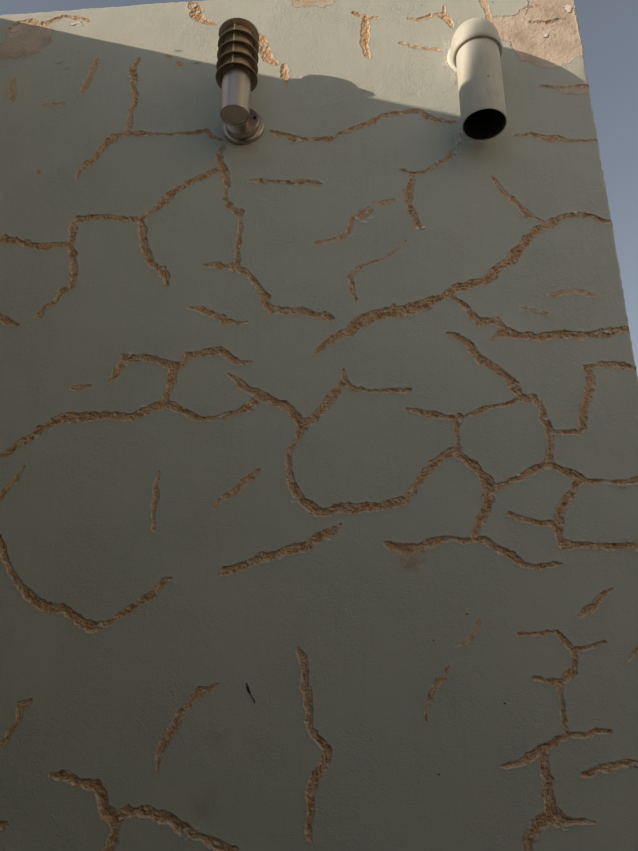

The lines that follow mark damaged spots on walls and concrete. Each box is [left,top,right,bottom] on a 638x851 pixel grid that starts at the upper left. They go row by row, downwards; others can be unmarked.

peeling [0,22,54,60]
crack [351,11,381,58]
peeling [491,0,583,69]
crack [0,56,638,577]
crack [0,534,177,634]
crack [577,587,614,618]
crack [0,698,33,749]
crack [155,683,221,772]
crack [296,646,332,843]
crack [500,629,613,851]
crack [580,758,638,778]
crack [47,770,239,851]